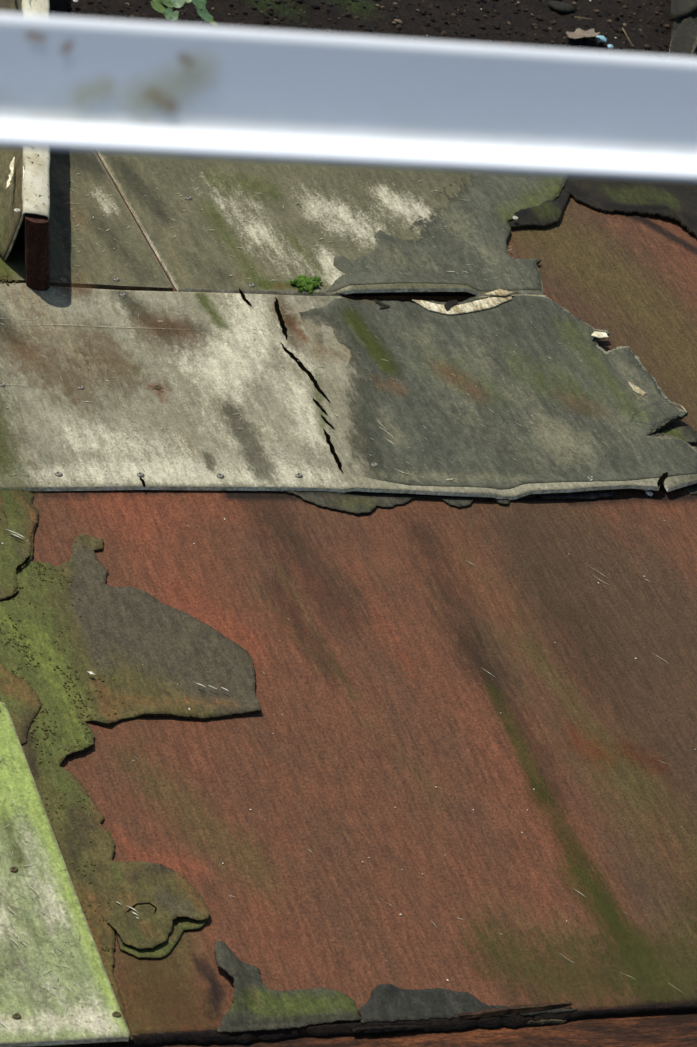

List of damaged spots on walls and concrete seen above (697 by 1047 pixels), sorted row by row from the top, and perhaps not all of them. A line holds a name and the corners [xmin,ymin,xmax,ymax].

leakage [217,404,274,480]
crack [239,288,343,473]
peeling [279,171,697,516]
peeling [0,489,262,1047]
peeling [214,941,577,1034]